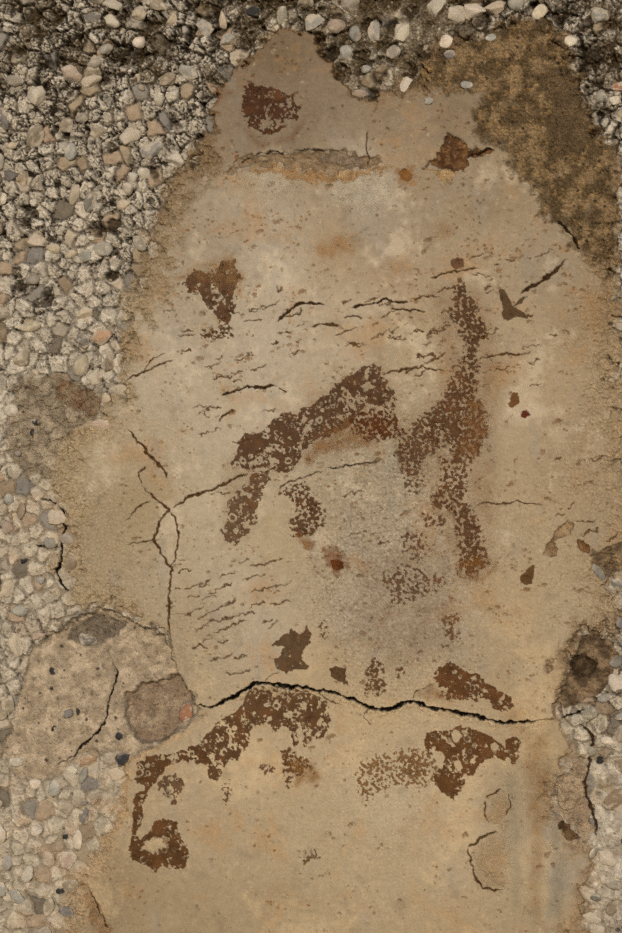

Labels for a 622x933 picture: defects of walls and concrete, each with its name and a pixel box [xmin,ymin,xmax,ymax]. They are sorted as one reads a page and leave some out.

spalling [414,18,619,268]
crack [125,252,557,436]
rust [220,257,490,607]
crack [521,221,580,293]
crack [58,670,119,765]
spalling [5,607,201,785]
rust [128,686,331,872]
rust [272,620,327,673]
crack [131,432,534,727]
rust [355,725,521,806]
rust [433,661,514,712]
spalling [556,634,619,708]